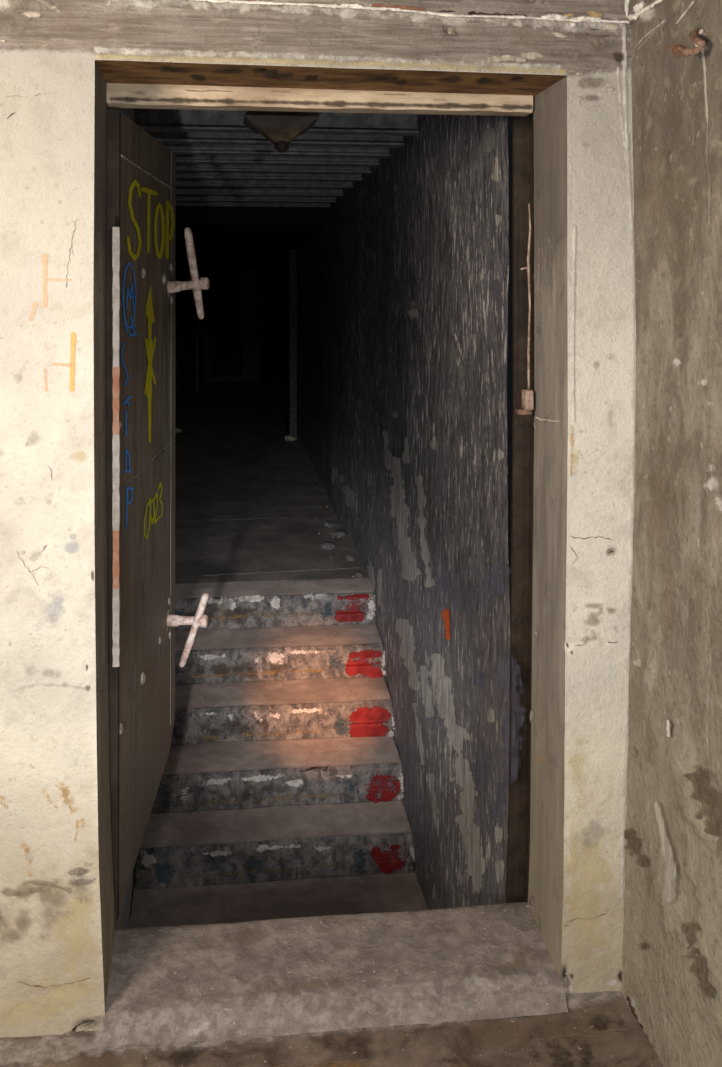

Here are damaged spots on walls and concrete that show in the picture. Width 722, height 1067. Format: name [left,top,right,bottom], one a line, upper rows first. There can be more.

water stain [116,0,159,8]
water stain [110,92,532,109]
water stain [183,0,654,899]
water stain [655,802,676,902]